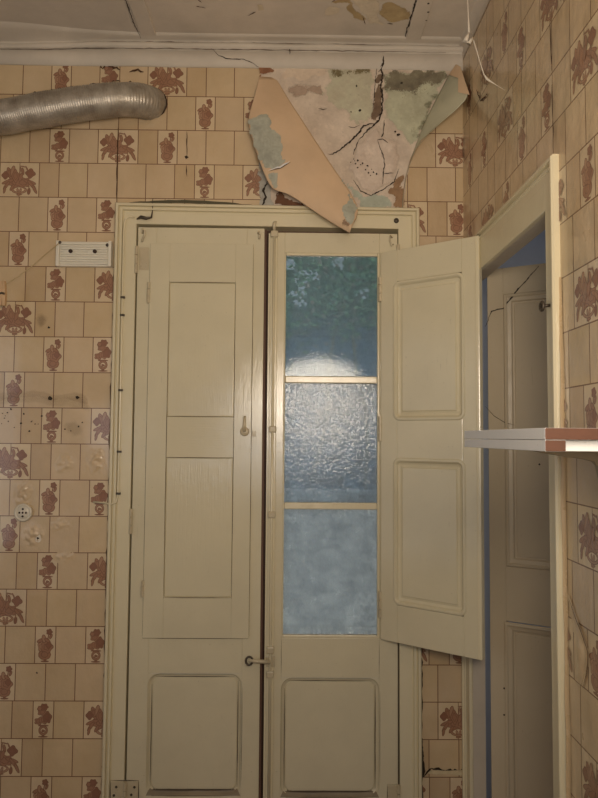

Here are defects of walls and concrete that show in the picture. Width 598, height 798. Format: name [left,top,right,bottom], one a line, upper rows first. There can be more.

peeling [324,0,411,26]
peeling [248,114,306,206]
crack [330,56,389,184]
peeling [259,64,470,224]